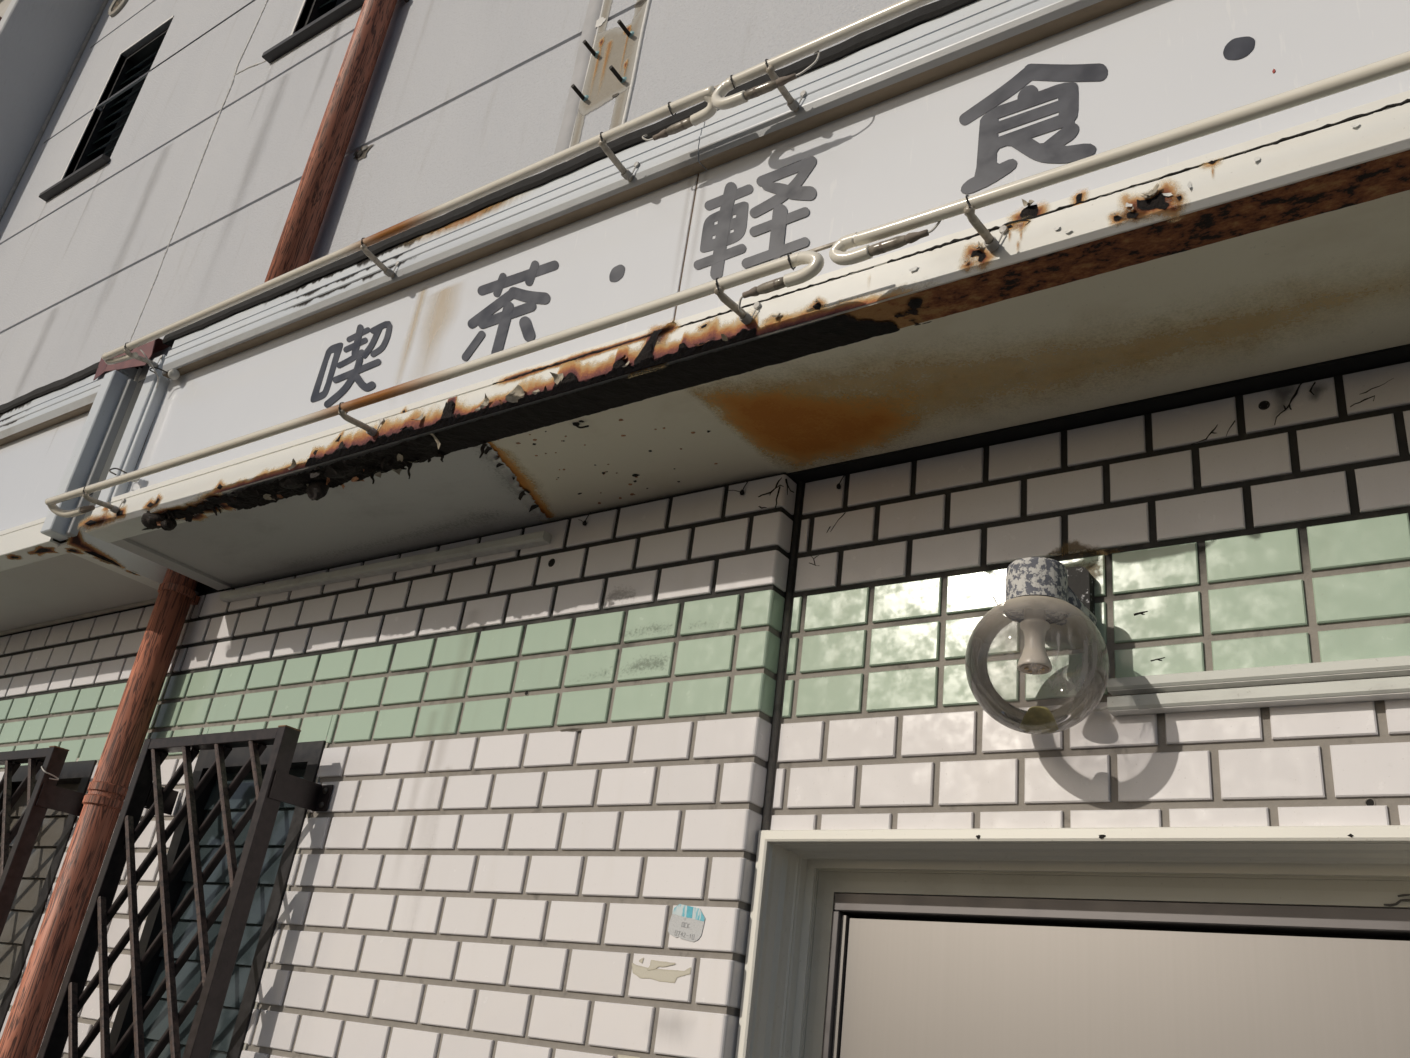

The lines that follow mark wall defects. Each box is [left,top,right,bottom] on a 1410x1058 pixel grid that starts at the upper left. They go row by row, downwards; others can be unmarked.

rust [6,150,1410,576]
crack [1274,380,1320,425]
crack [1350,379,1392,407]
crack [1191,420,1235,445]